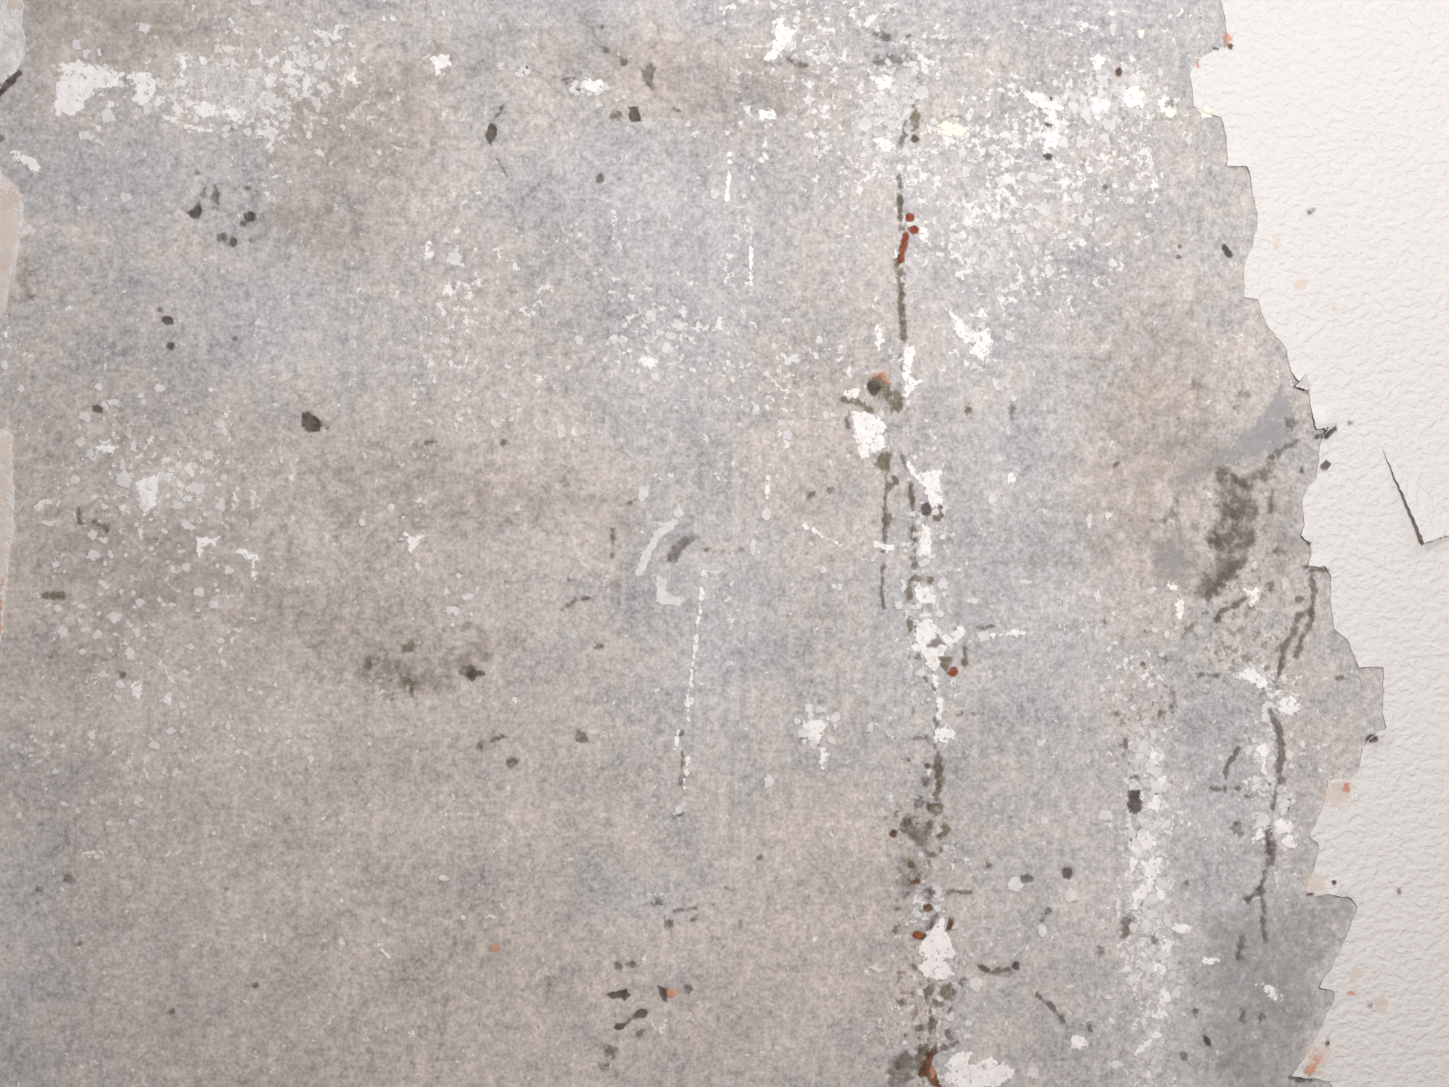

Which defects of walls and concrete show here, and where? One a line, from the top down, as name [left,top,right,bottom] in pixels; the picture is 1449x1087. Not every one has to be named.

peeling [871,111,888,131]
peeling [890,80,911,107]
crack [901,106,920,142]
peeling [1076,85,1098,102]
corrosion [897,196,919,263]
peeling [1382,449,1449,544]
crack [841,193,1026,1087]
crack [1202,597,1246,622]
crack [1210,578,1317,960]
crack [1007,876,1054,943]